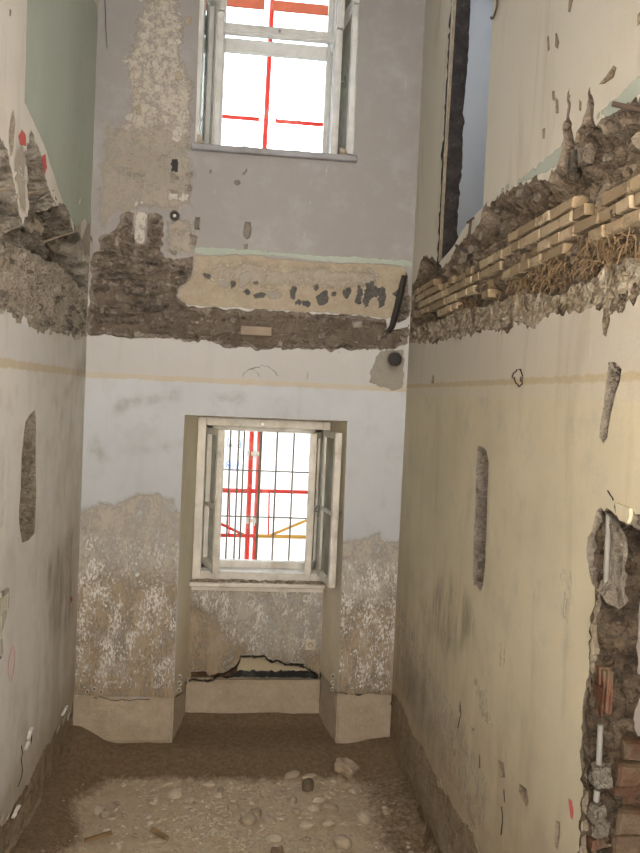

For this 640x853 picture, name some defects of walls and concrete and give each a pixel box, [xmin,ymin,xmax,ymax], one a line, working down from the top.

peeling [117,0,192,145]
spalling [599,65,616,84]
spalling [165,159,193,194]
peeling [134,211,147,244]
spalling [190,217,200,246]
peeling [178,222,406,318]
spalling [409,257,640,344]
crack [176,655,393,707]